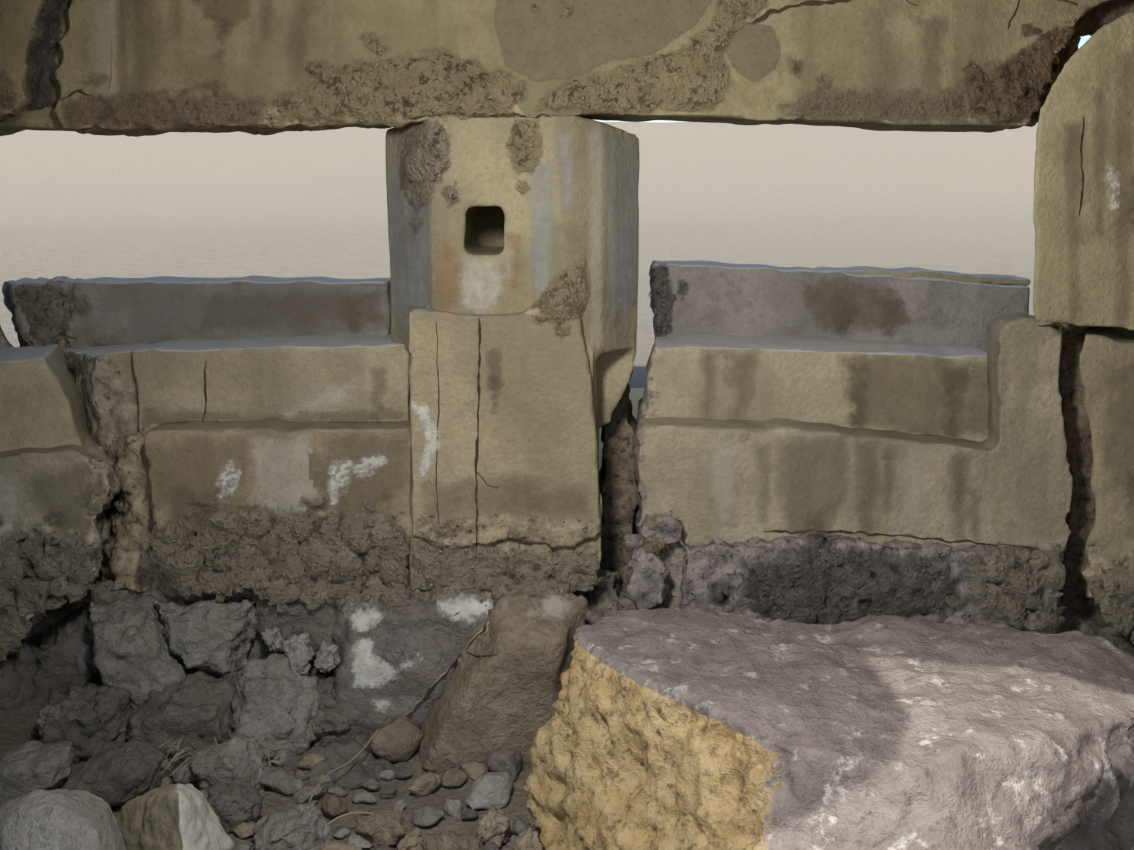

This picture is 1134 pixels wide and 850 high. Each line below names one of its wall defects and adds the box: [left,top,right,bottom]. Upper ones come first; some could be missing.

crack [0,0,113,123]
crack [728,0,853,38]
crack [1007,0,1020,29]
spalling [963,21,1078,124]
crack [1049,0,1134,37]
water stain [329,456,388,505]
crack [474,318,498,549]
crack [599,371,638,578]
crack [764,323,1116,626]
spalling [0,512,100,660]
spalling [138,493,606,614]
spalling [707,533,1070,630]